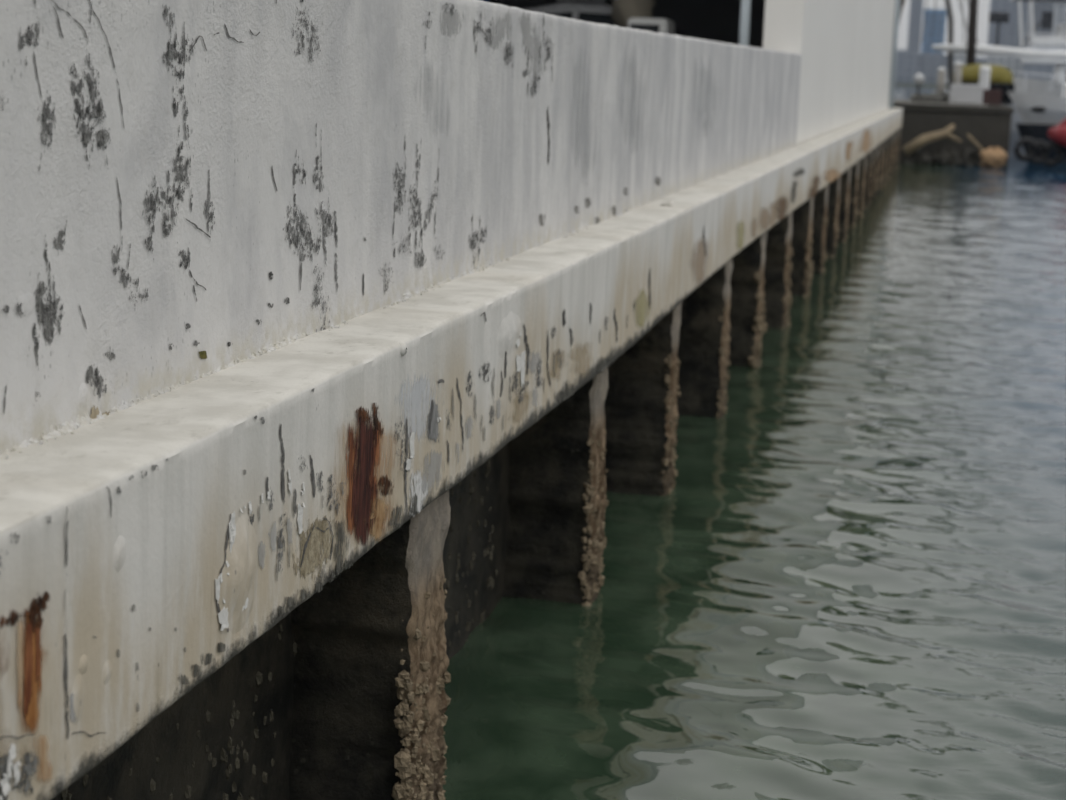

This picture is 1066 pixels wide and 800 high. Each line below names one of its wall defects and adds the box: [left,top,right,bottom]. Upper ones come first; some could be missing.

crack [34,54,42,98]
crack [52,0,124,126]
rust [341,403,394,545]
spalling [179,424,353,685]
rust [0,592,51,781]
spalling [0,734,40,800]